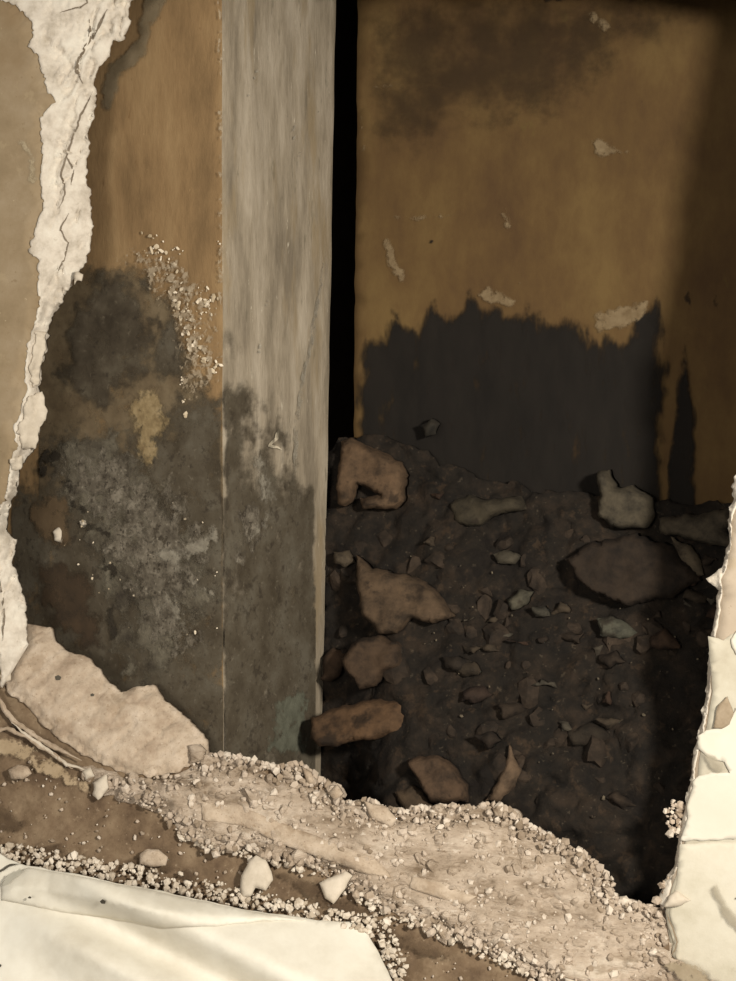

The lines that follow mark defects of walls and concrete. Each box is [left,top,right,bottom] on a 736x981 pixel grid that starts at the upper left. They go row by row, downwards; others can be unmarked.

crack [57,0,108,273]
peeling [594,139,617,156]
flaking render [0,0,210,779]
water stain [11,231,316,770]
peeling [384,239,405,281]
peeling [479,287,515,307]
water stain [357,298,696,505]
peeling [595,301,648,332]
flaking render [77,475,736,981]